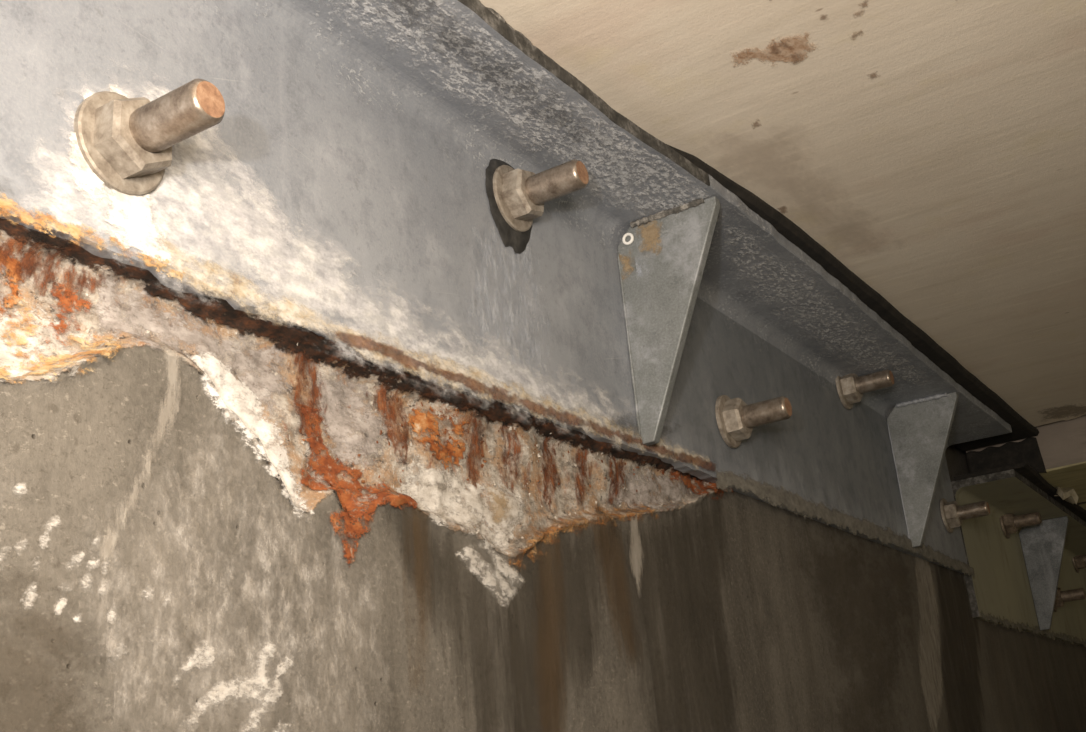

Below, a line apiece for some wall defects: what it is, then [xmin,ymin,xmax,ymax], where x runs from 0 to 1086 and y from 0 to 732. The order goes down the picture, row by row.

rust [0,193,185,281]
rust [291,350,418,564]
spalling [0,228,733,603]
rust [337,333,716,471]
leakage [76,552,108,591]
leakage [259,505,323,654]